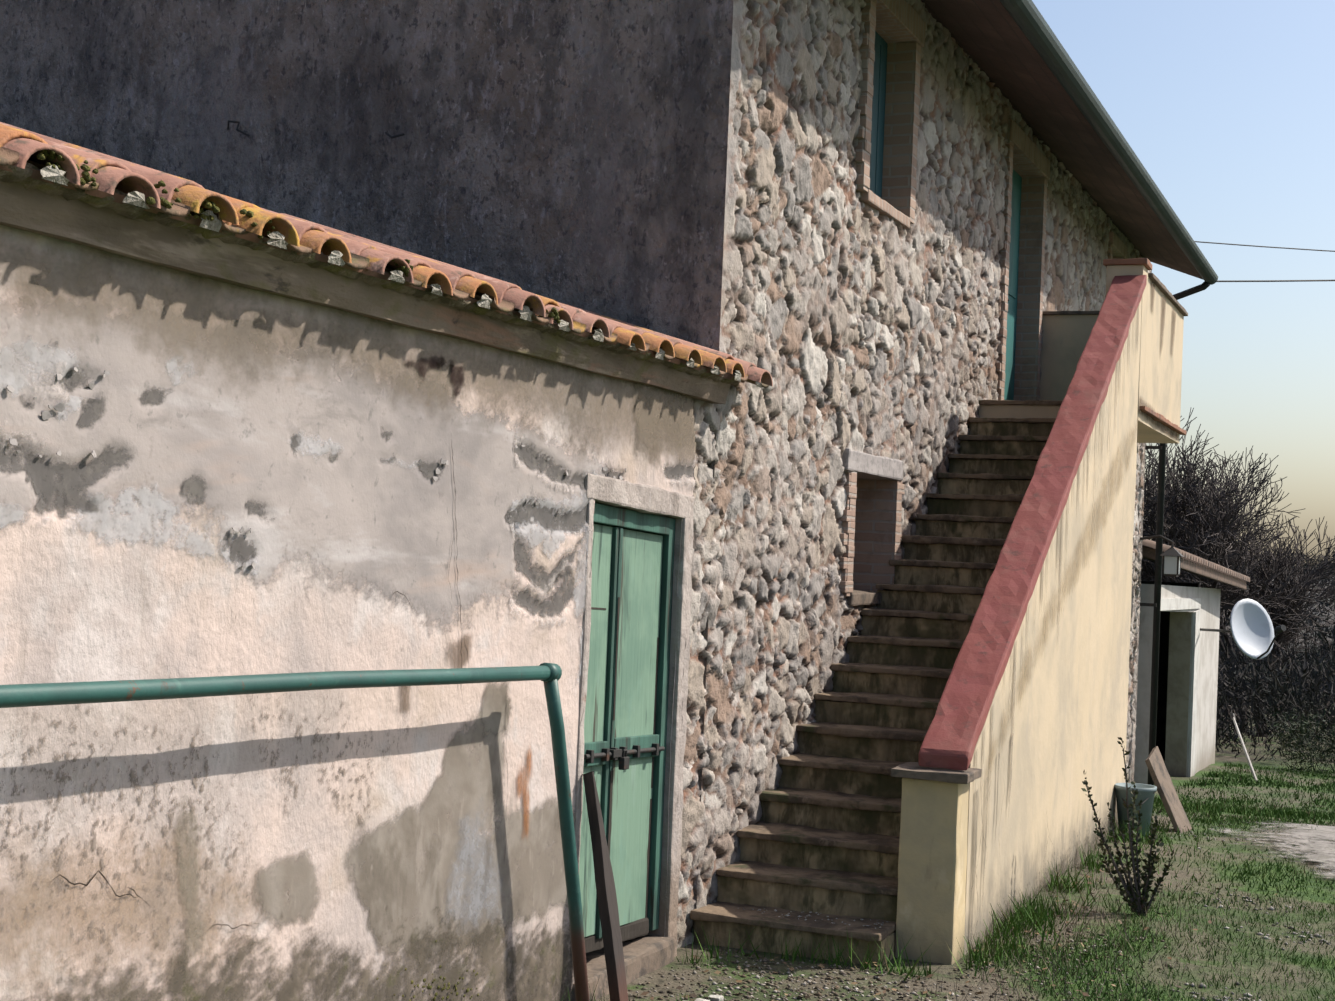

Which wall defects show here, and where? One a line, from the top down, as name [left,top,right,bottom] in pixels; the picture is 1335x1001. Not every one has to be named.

peeling [0,295,626,631]
flaking render [662,460,697,488]
rust [518,751,532,833]
crack [47,858,151,907]
water stain [0,682,576,1001]